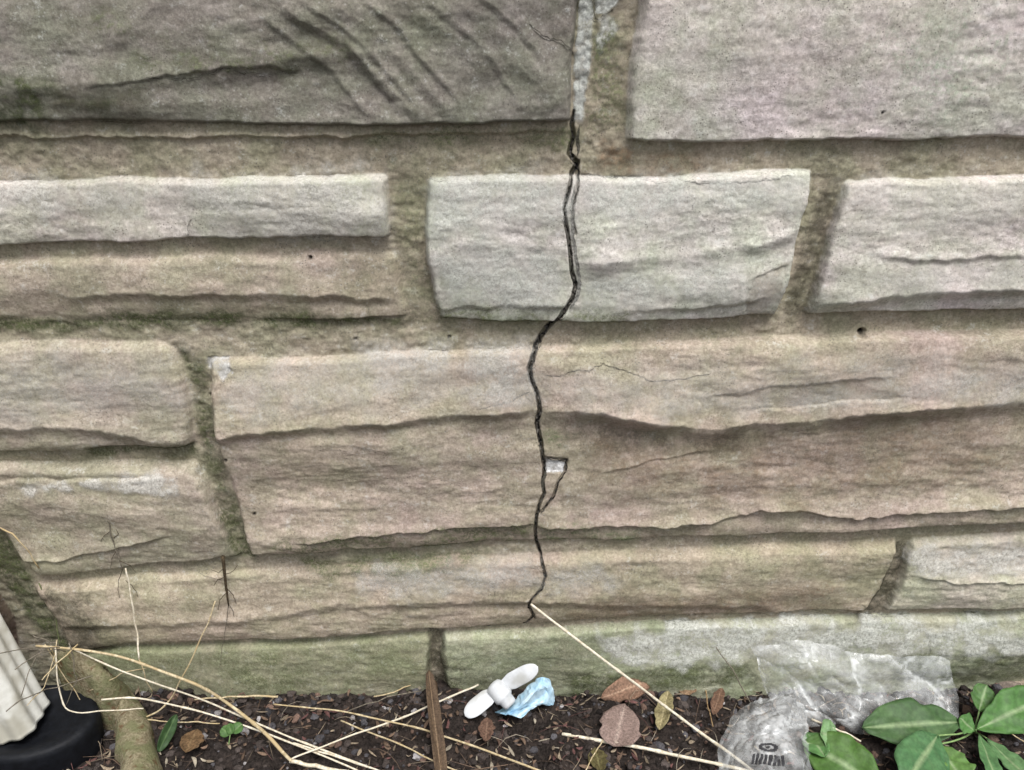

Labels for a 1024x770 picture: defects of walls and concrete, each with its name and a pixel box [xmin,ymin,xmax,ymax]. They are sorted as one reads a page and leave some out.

crack [478,111,788,626]
leakage [45,592,98,648]
leakage [427,628,449,686]
leakage [604,611,1024,670]